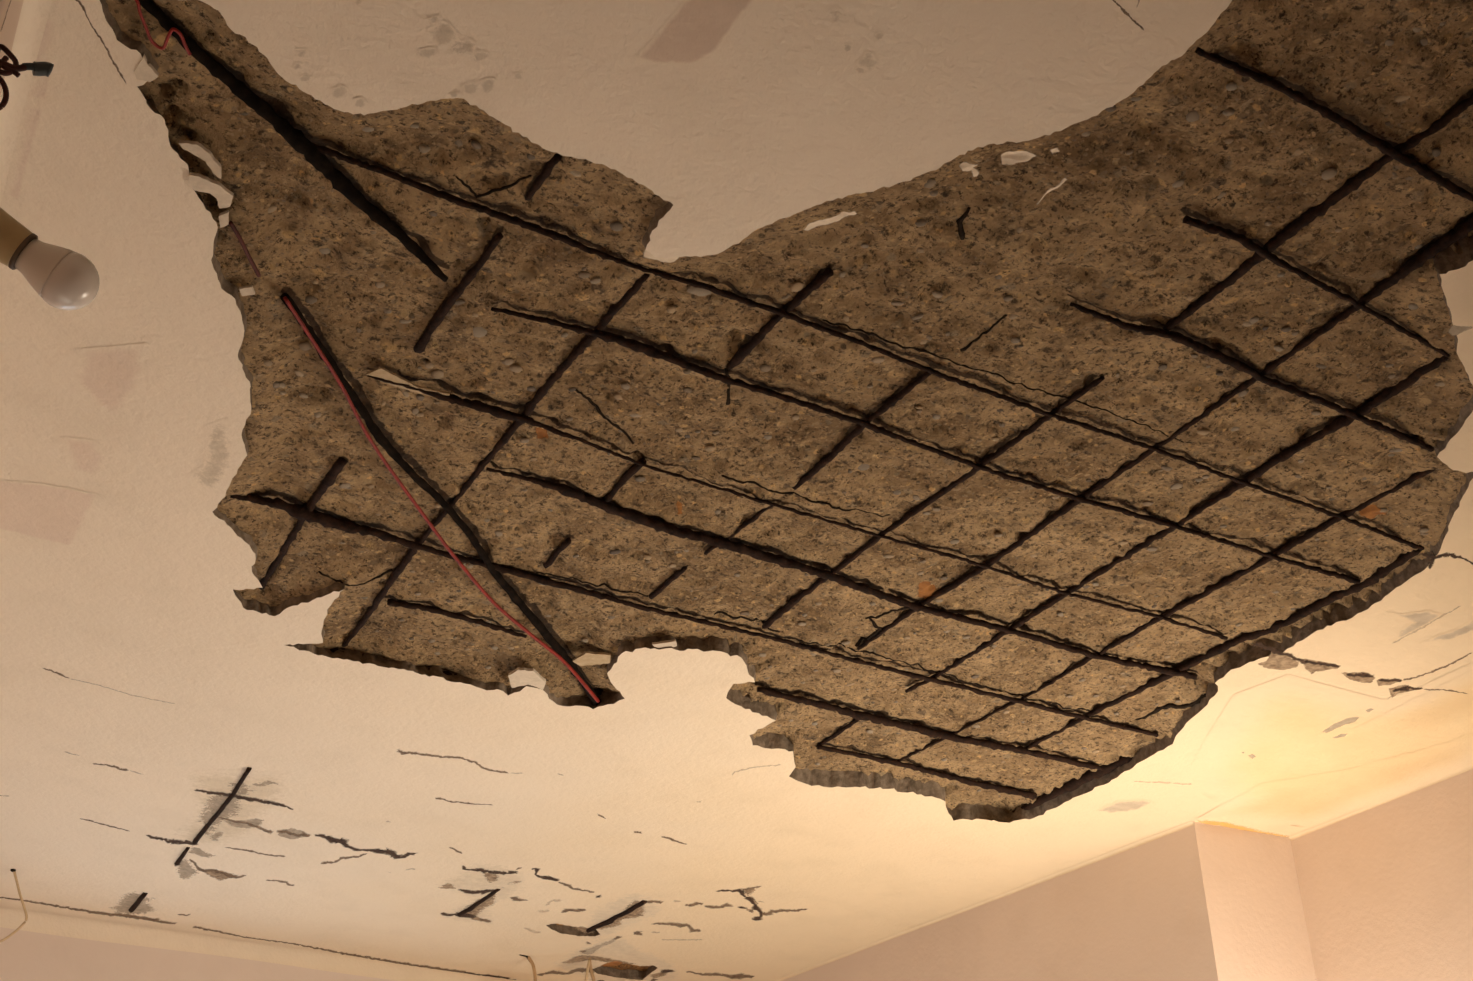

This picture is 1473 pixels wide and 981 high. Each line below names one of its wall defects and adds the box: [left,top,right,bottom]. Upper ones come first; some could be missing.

spalling [106,0,1473,813]
spalling [146,767,297,880]
crack [398,750,508,805]
spalling [111,892,154,915]
spalling [429,847,533,926]
spalling [537,886,807,981]